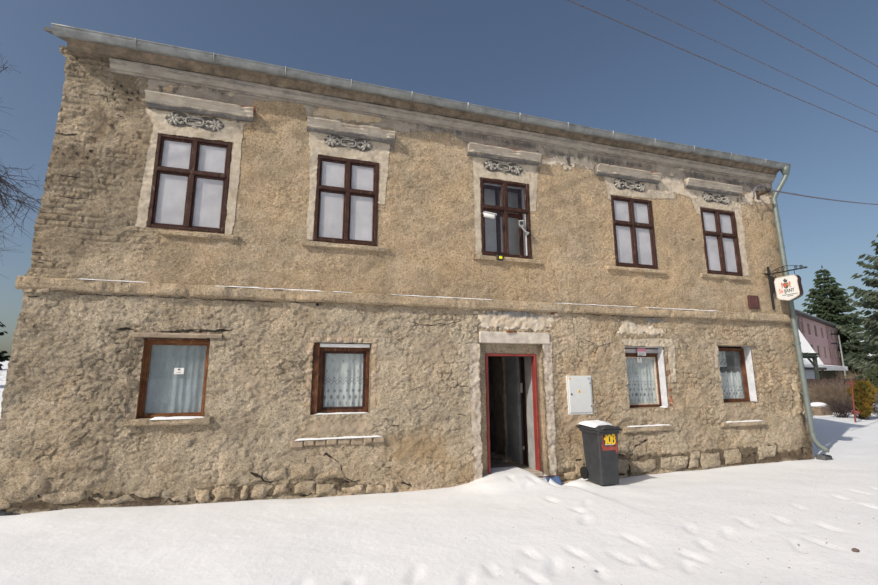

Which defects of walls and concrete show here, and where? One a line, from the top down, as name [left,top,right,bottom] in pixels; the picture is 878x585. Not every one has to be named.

peeling [541,155,597,170]
peeling [653,168,698,201]
peeling [739,188,771,205]
crack [28,290,317,303]
crack [161,329,233,340]
peeling [473,310,558,332]
peeling [617,319,665,336]
crack [115,327,139,423]
crack [235,472,313,497]
crack [109,490,213,503]